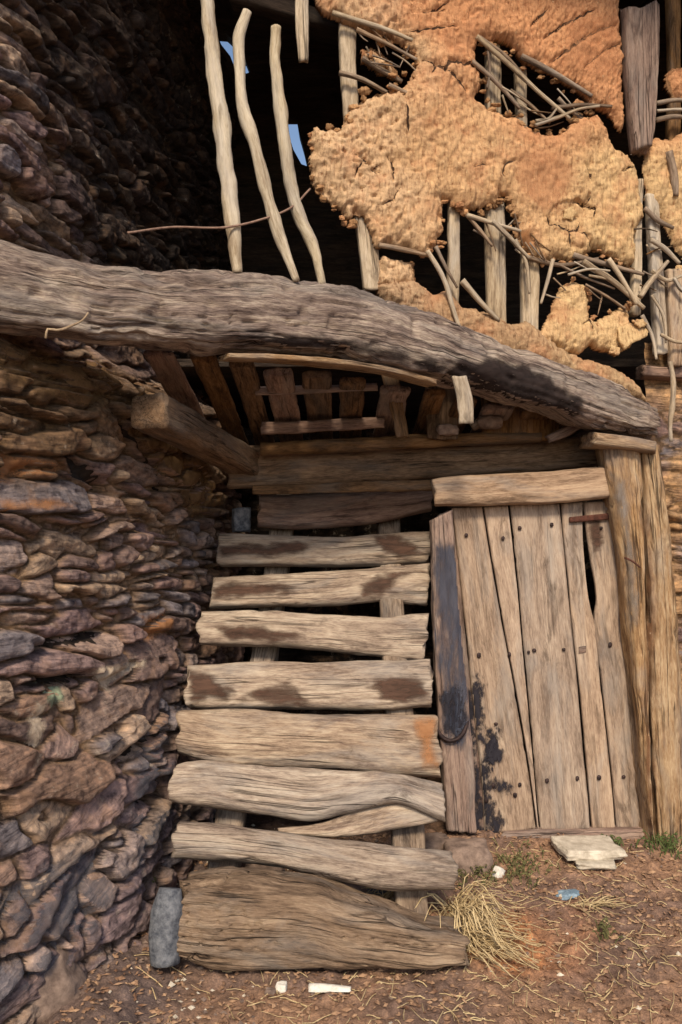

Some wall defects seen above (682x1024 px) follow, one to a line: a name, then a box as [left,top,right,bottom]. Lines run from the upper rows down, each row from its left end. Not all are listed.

spalling [478,63,595,136]
peeling [440,194,648,356]
crack [547,166,596,246]
damp [415,544,513,833]